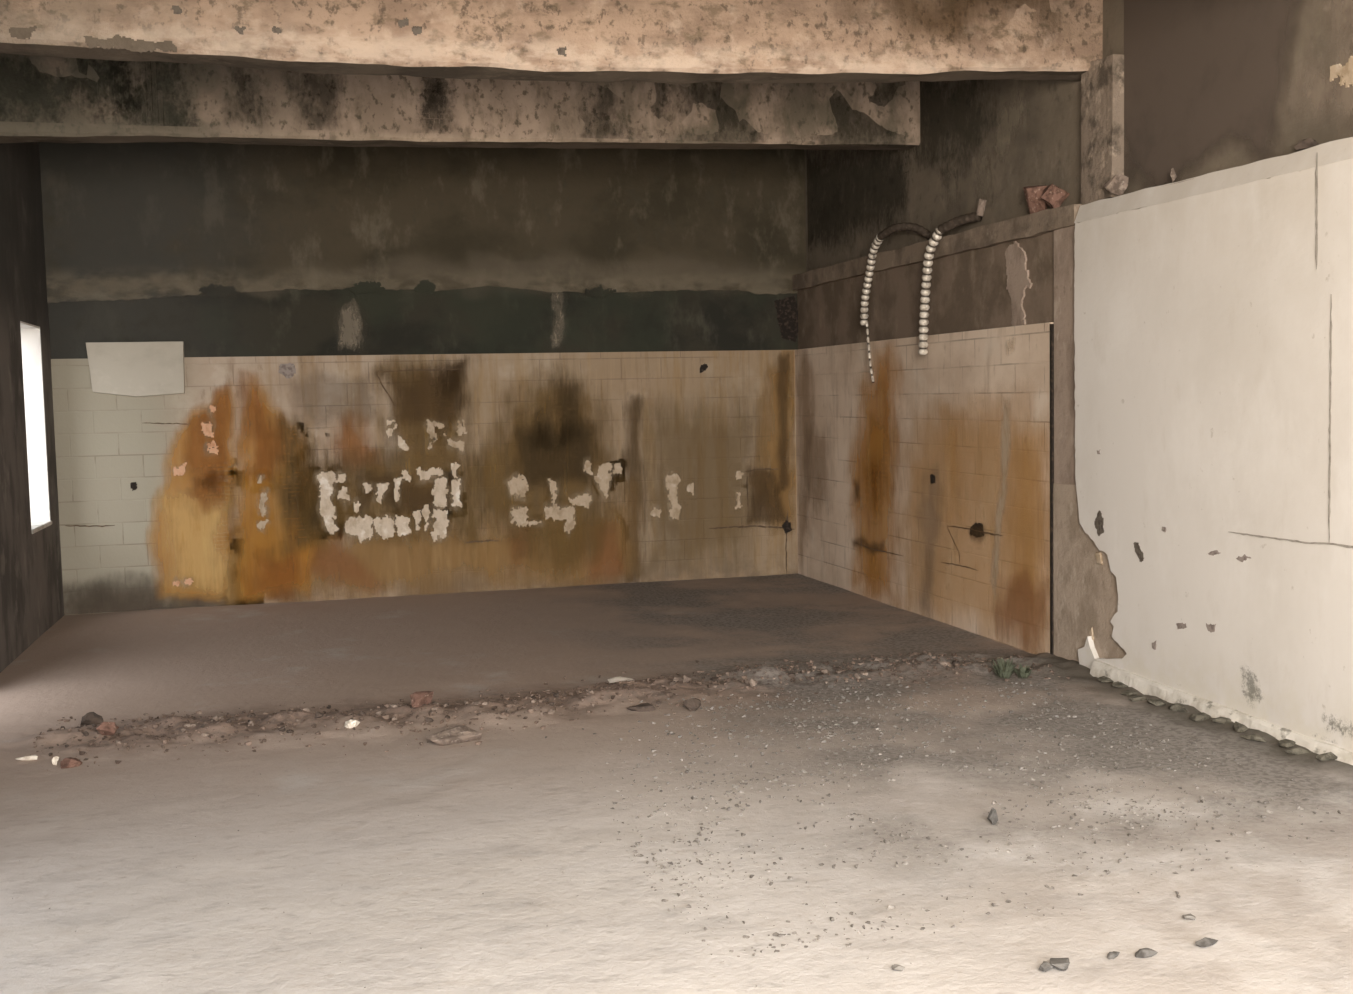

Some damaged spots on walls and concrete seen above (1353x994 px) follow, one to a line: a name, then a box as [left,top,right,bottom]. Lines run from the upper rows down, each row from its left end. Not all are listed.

damp [0,58,196,127]
damp [690,87,760,137]
peeling [1330,56,1353,88]
damp [339,302,361,350]
corrosion [155,384,312,597]
peeling [316,419,467,543]
damp [275,364,640,593]
peeling [508,460,623,534]
corrosion [853,357,894,588]
spalling [1053,483,1127,662]